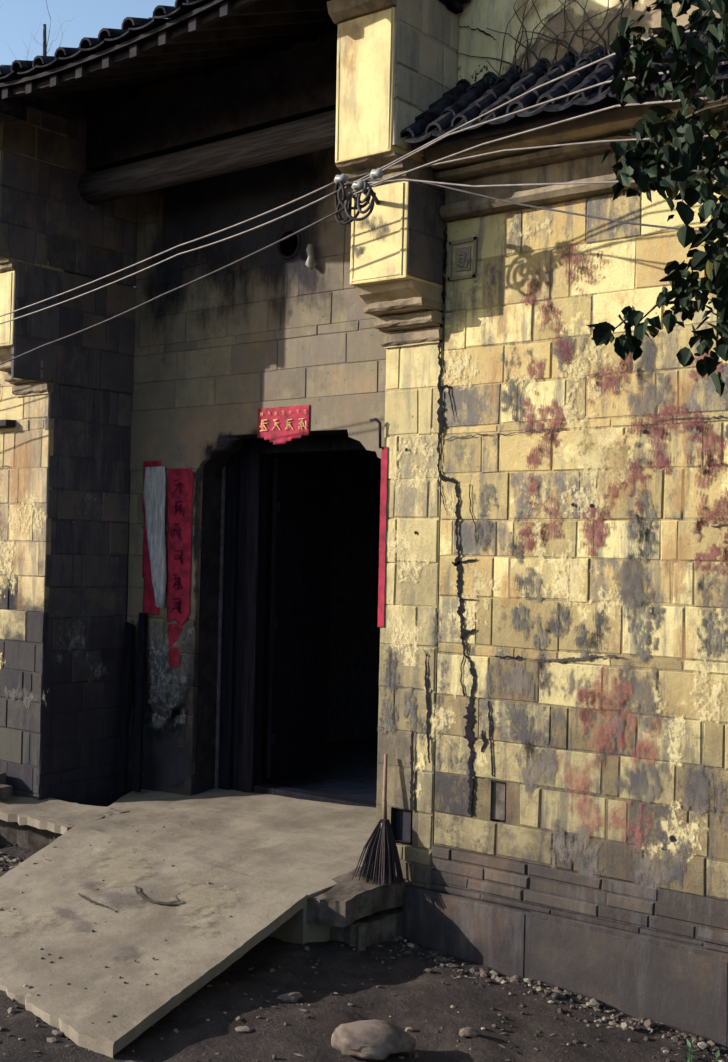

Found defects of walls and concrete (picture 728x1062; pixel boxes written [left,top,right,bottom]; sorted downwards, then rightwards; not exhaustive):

leakage [500,342,532,425]
leakage [611,335,674,418]
peeling [7,490,46,535]
crack [436,227,625,815]
peeling [147,623,194,728]
crack [410,649,431,811]
leakage [378,607,475,782]
leakage [484,501,609,793]
peeling [559,668,685,846]
leakage [596,489,665,765]
peeling [692,681,724,723]
leakage [694,571,728,666]